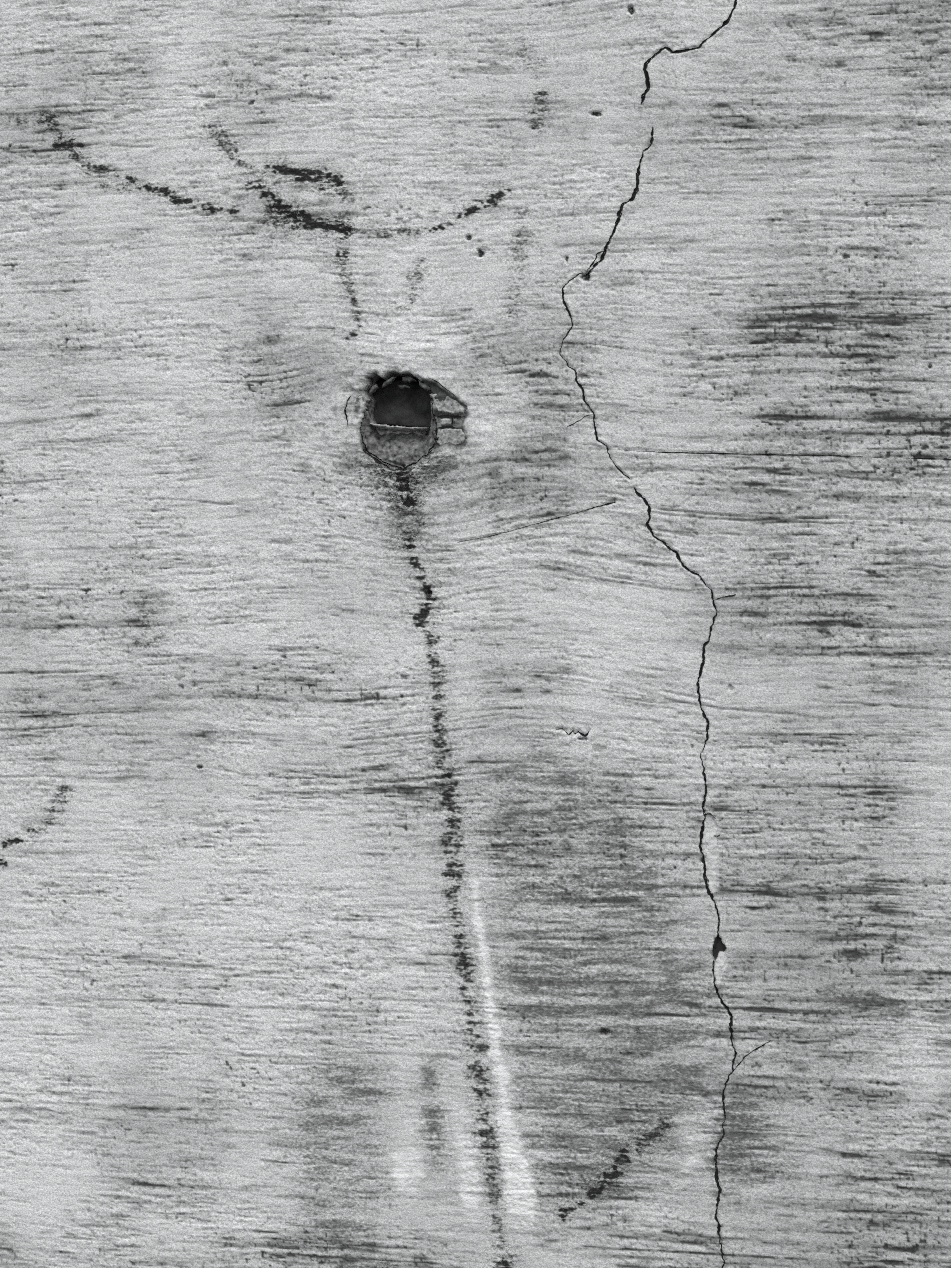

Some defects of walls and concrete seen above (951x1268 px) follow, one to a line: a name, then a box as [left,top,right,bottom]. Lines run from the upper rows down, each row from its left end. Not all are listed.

crack [559,0,771,1268]